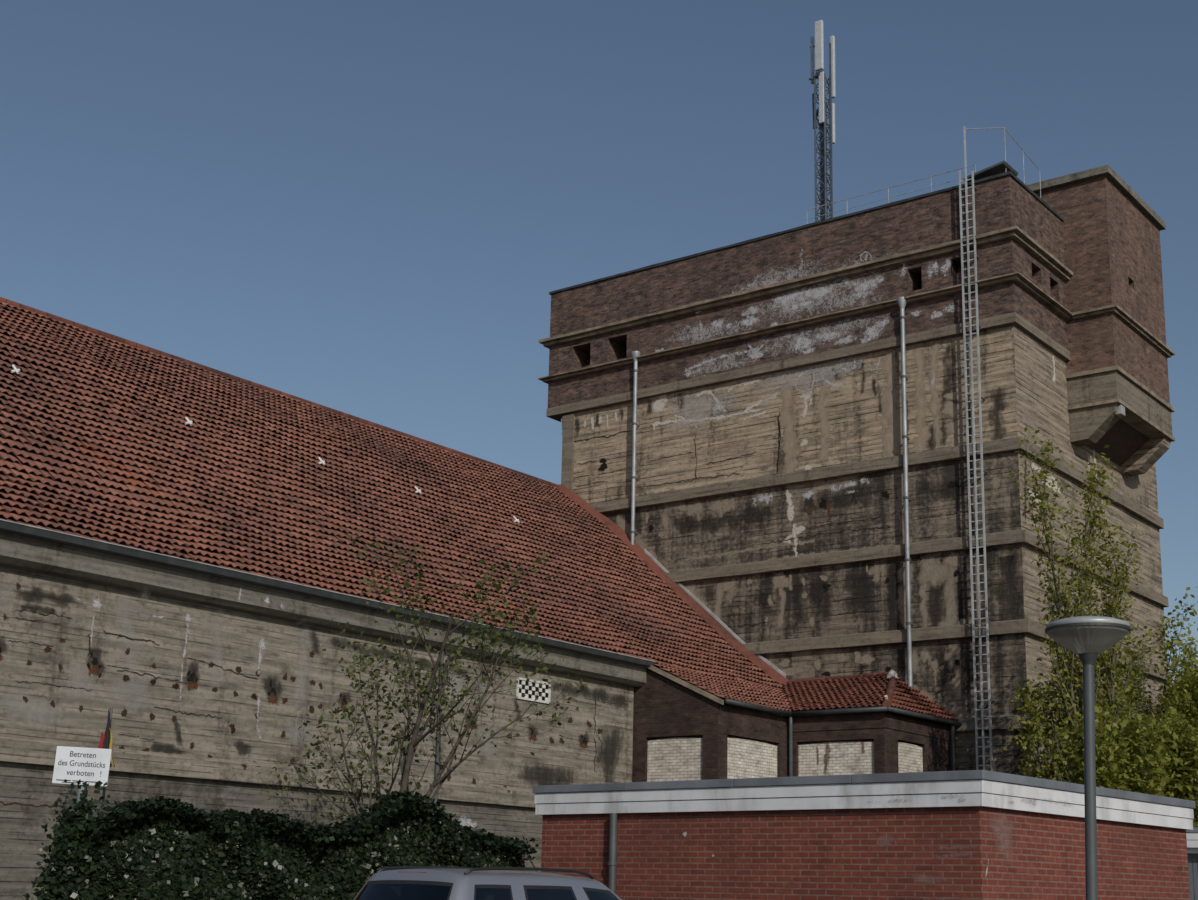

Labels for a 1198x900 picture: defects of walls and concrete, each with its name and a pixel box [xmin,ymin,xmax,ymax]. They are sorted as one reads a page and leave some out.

damp [928,348,973,450]
damp [990,388,1005,440]
damp [675,477,870,557]
damp [894,475,913,544]
damp [19,588,79,614]
damp [929,582,943,627]
damp [996,551,1025,621]
spalling [87,648,103,675]
spalling [187,663,199,690]
spalling [264,678,281,704]
damp [965,655,977,693]